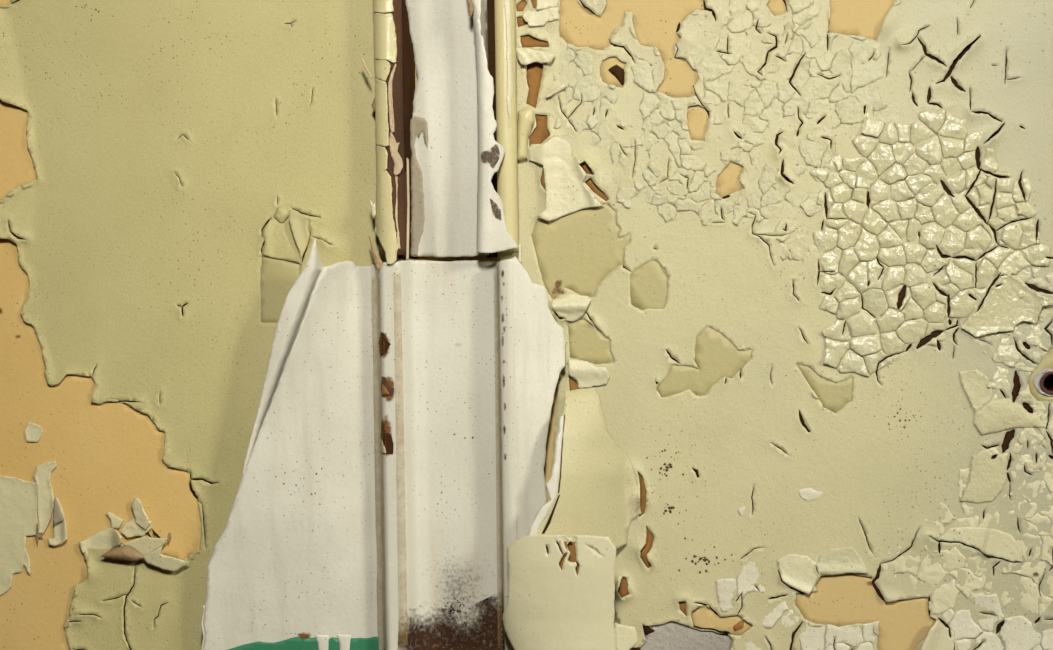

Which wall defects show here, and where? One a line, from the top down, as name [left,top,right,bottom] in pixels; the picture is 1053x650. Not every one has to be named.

spalling [487,0,496,141]
peeling [0,99,37,204]
spalling [397,0,418,258]
crack [775,129,832,184]
crack [718,195,787,266]
crack [821,193,844,230]
crack [869,1,1053,483]
peeling [516,0,1053,650]
crack [842,258,906,335]
peeling [0,206,394,650]
crack [858,517,919,602]
corrosion [398,597,505,650]